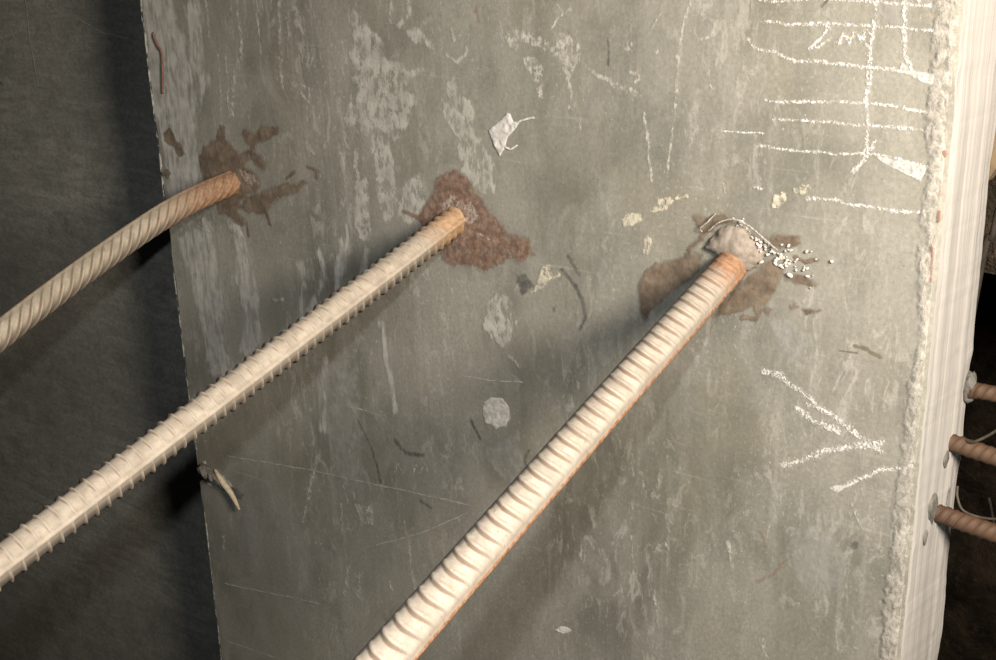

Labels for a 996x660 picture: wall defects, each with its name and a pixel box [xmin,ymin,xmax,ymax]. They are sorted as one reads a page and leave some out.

corrosion [164,128,184,157]
corrosion [199,125,319,237]
corrosion [404,171,532,270]
corrosion [638,216,729,317]
corrosion [718,260,815,321]
corrosion [770,235,819,264]